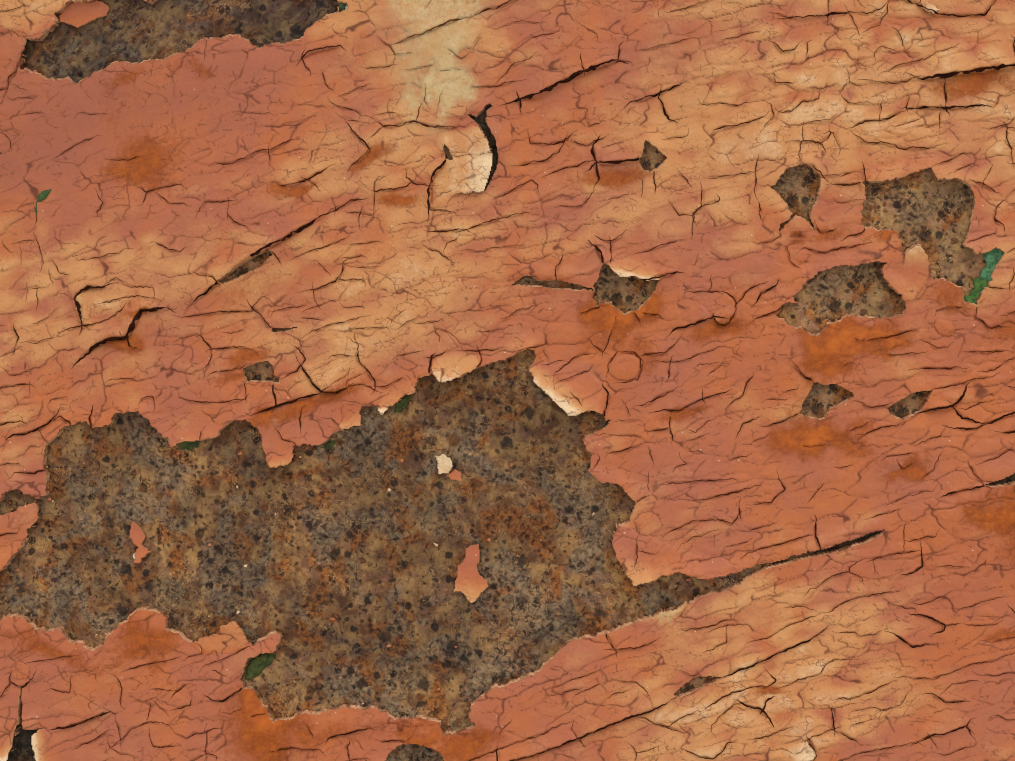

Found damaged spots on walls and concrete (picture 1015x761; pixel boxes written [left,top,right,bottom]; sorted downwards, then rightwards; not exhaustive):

peeling [0,0,348,89]
crack [624,0,1015,329]
crack [0,0,871,568]
peeling [511,248,667,315]
peeling [771,163,1005,337]
rust [247,385,355,427]
peeling [0,349,885,735]
crack [470,330,1015,761]
peeling [0,686,62,761]
crack [46,643,265,761]
rust [229,689,311,761]
rust [388,722,498,761]